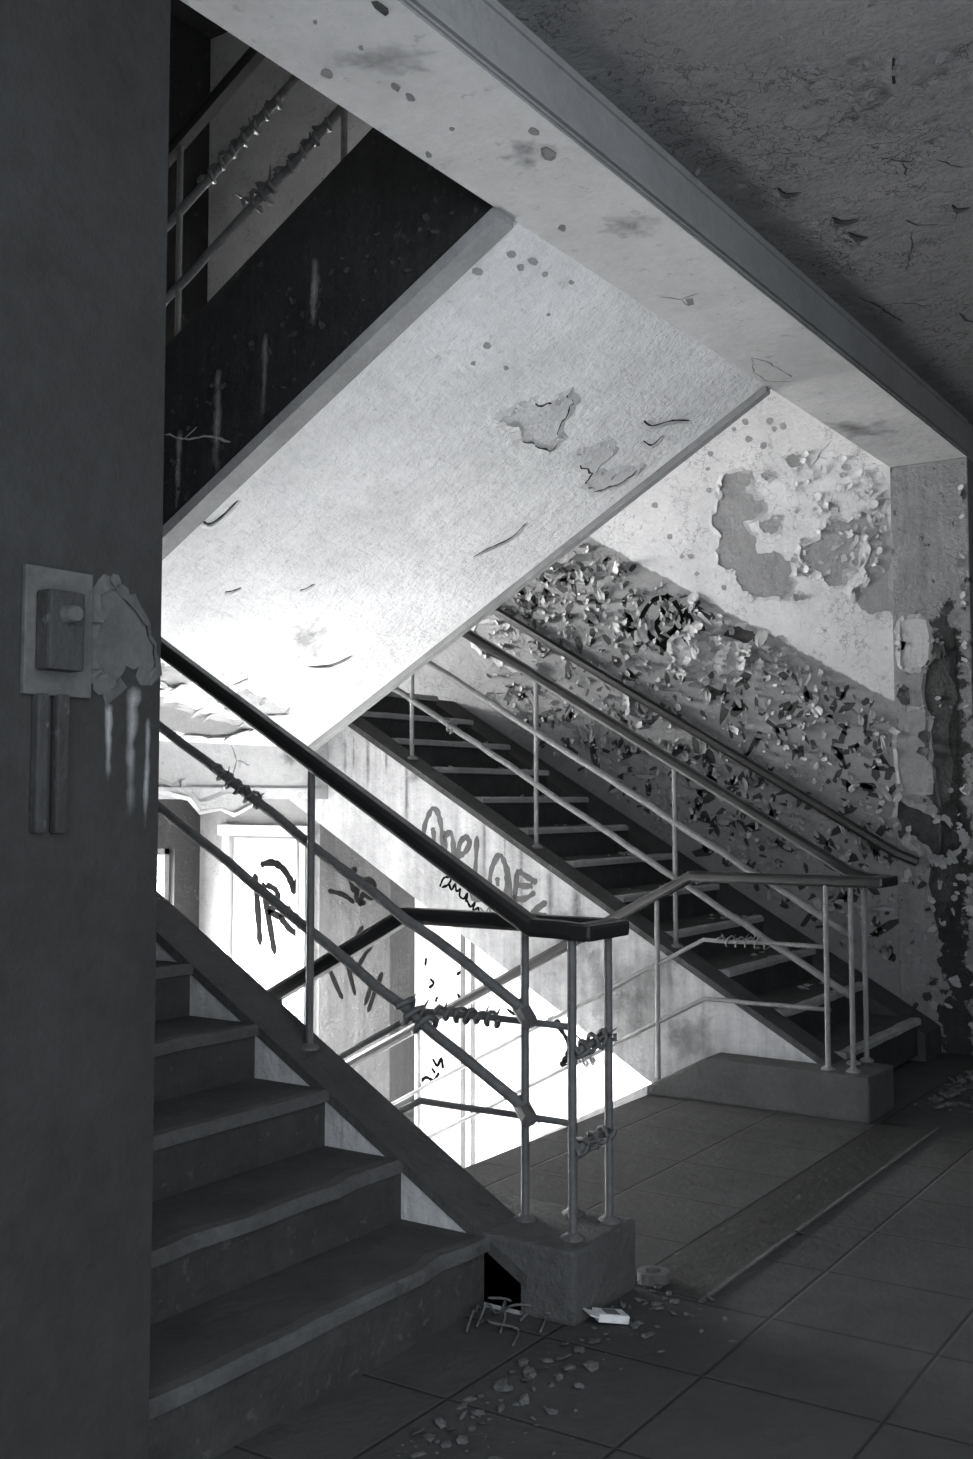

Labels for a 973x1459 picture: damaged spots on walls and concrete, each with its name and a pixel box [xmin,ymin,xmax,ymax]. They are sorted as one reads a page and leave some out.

peeling [493,386,690,497]
peeling [471,417,973,988]
peeling [912,992,953,1041]